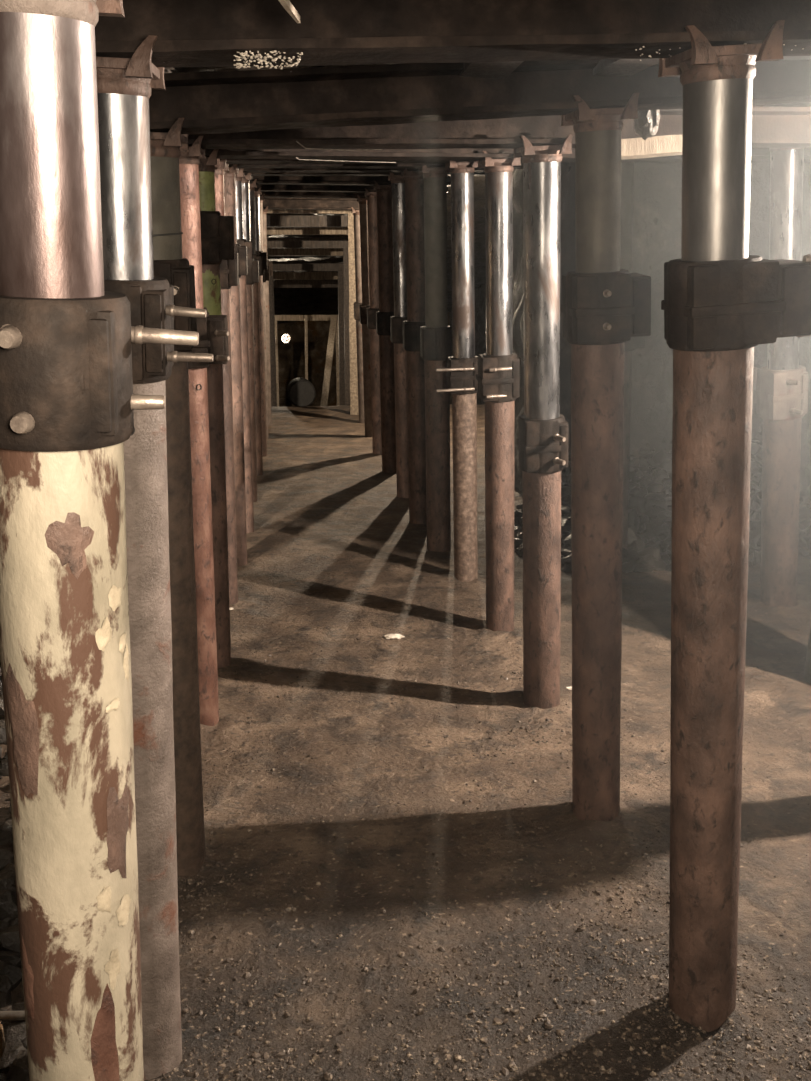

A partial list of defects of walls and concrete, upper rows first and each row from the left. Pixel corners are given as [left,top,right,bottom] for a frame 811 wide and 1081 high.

rust [45,512,94,579]
peeling [95,585,129,682]
rust [5,663,39,796]
rust [106,782,129,878]
peeling [97,885,132,927]
rust [22,936,34,1022]
rust [91,983,120,1081]